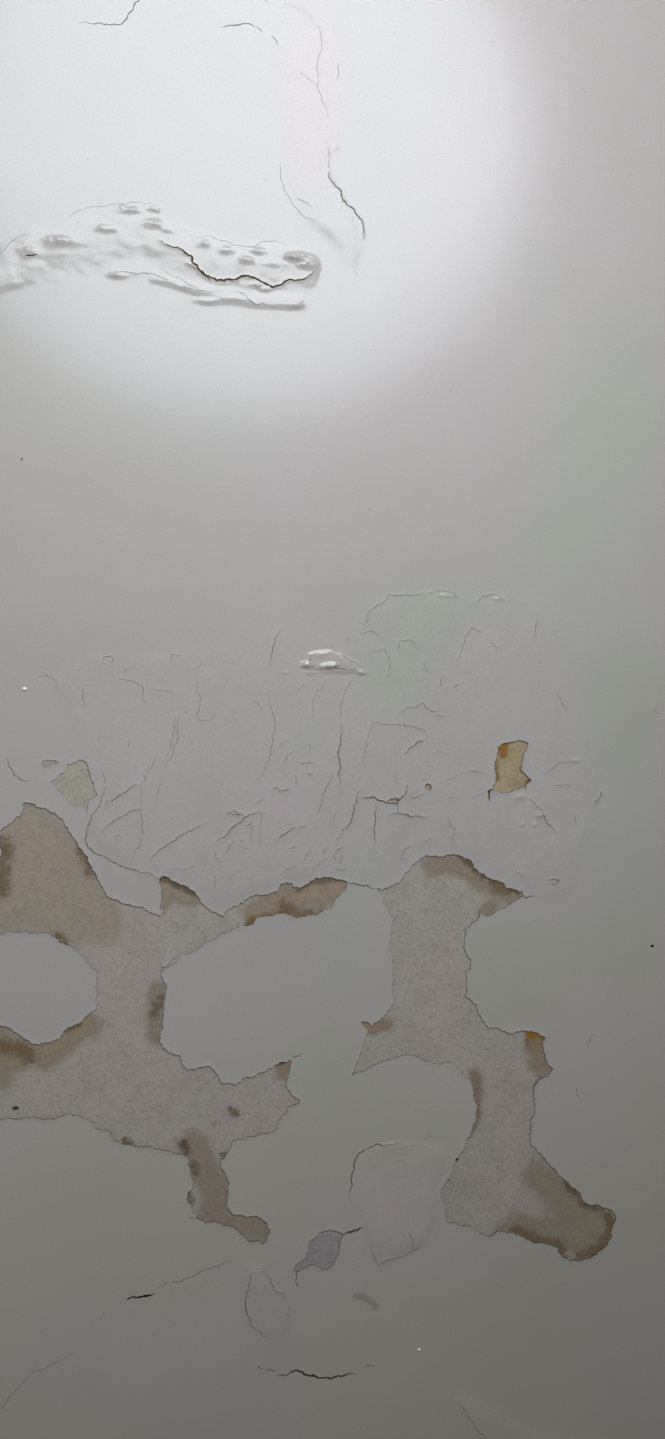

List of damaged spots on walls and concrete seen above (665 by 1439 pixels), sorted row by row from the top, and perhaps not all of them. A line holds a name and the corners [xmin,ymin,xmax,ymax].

crack [81,0,139,26]
crack [328,172,364,234]
crack [163,242,314,288]
crack [85,784,306,878]
crack [337,725,426,844]
peeling [490,737,534,796]
peeling [0,757,350,1247]
peeling [350,852,618,1263]
peeling [291,1228,346,1273]
crack [100,1258,370,1380]